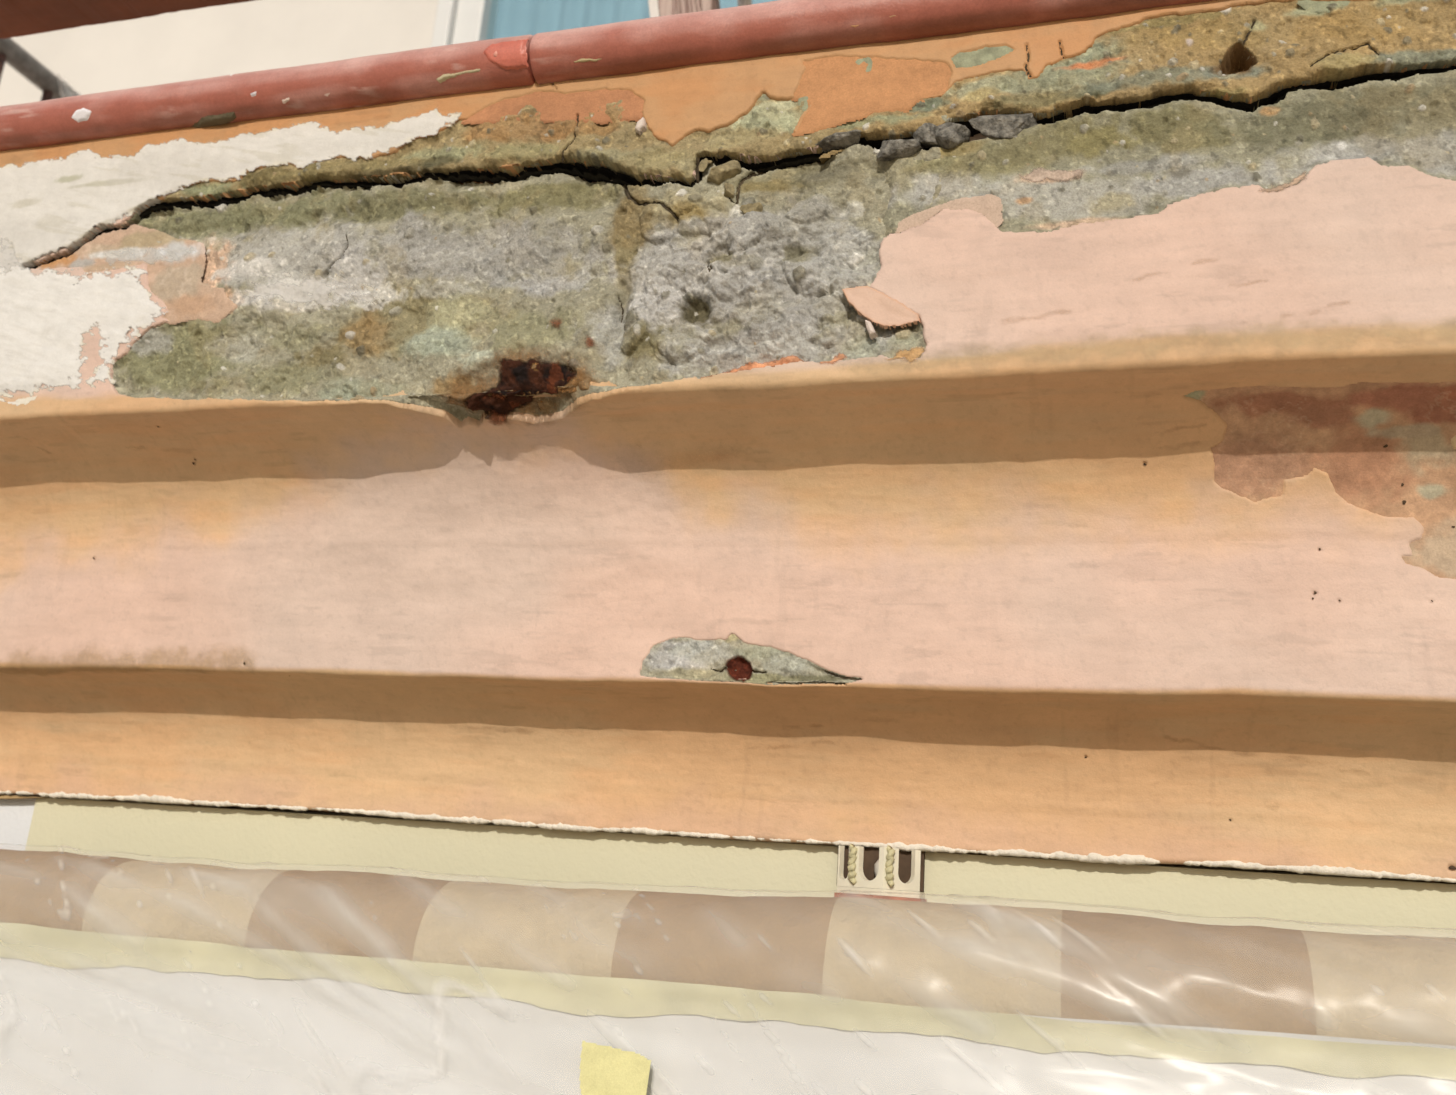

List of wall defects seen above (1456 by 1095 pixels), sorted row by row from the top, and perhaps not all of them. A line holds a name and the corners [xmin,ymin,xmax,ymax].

crack [955,42,1456,137]
crack [28,84,930,269]
spalling [34,0,1456,421]
corrosion [447,353,582,425]
peeling [1185,382,1456,579]
corrosion [726,656,754,682]
spalling [640,634,862,685]